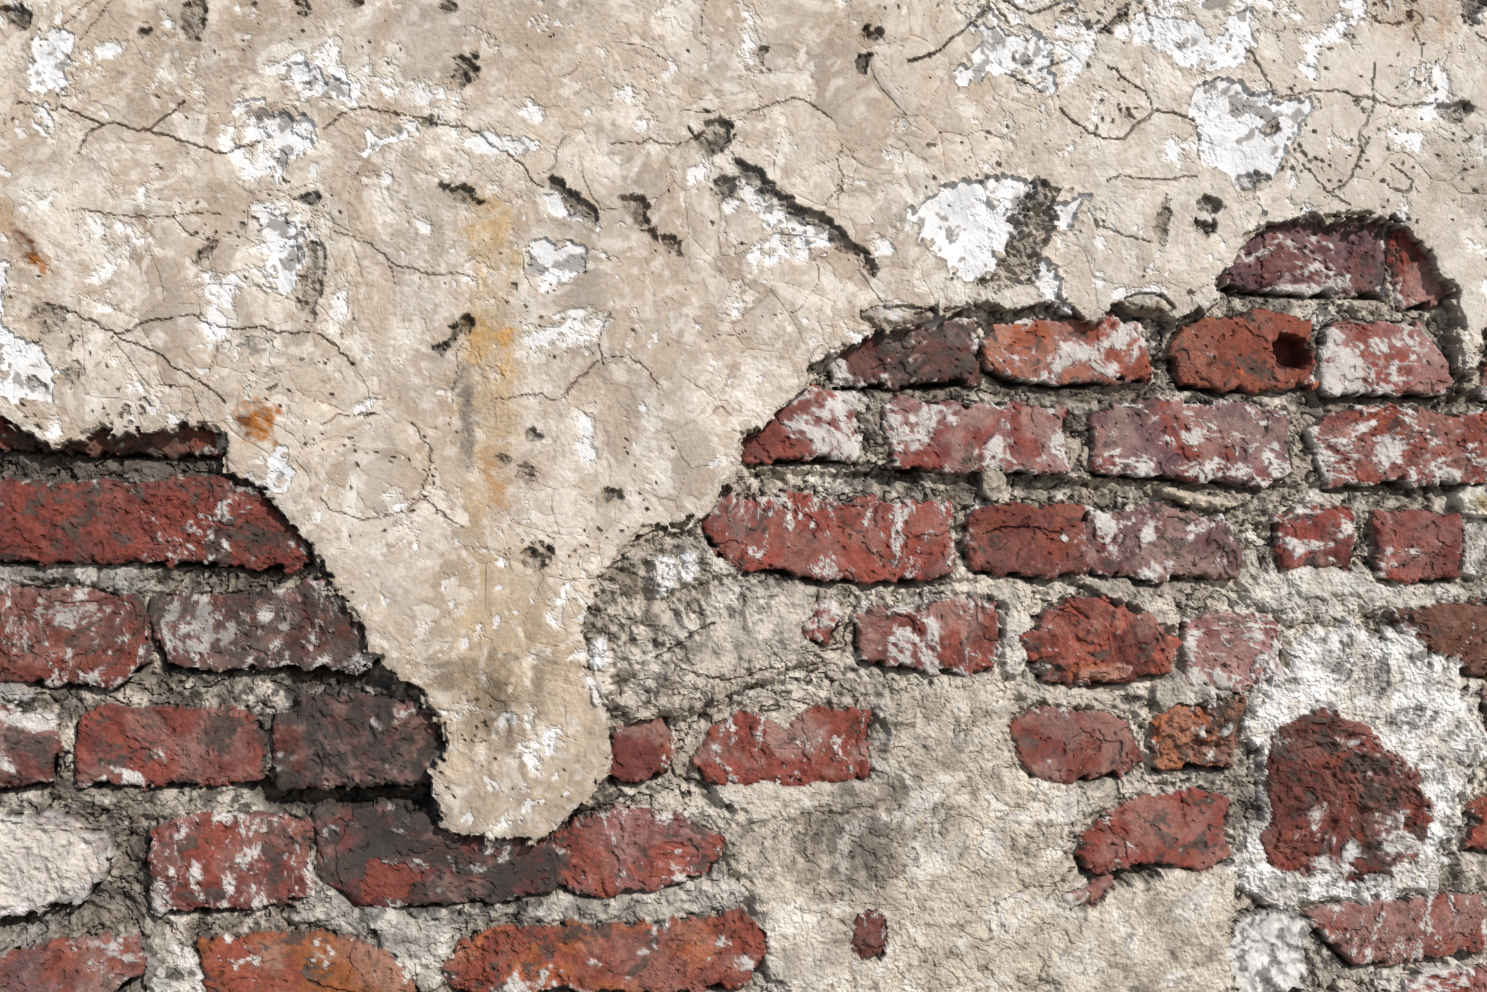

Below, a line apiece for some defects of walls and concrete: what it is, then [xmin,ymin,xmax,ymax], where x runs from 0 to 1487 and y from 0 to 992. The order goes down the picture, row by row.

crack [907,0,1061,63]
crack [17,99,263,156]
spalling [688,115,880,279]
peeling [907,174,1126,330]
crack [1004,61,1202,183]
peeling [1013,0,1487,381]
crack [1244,47,1434,196]
crack [58,305,359,406]
spalling [0,261,606,849]
spalling [588,325,914,720]
spalling [1271,723,1426,872]
water stain [1221,615,1487,992]